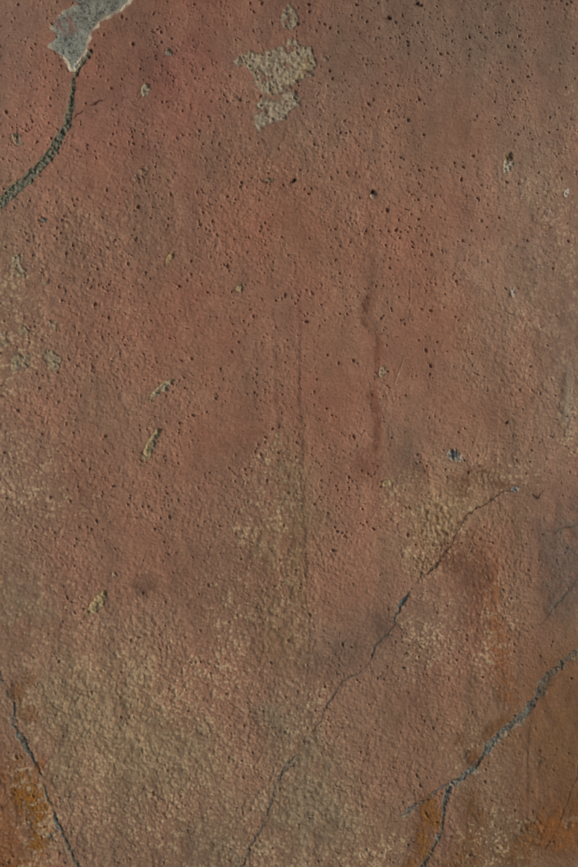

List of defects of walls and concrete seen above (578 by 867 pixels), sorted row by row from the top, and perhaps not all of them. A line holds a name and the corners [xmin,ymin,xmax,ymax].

crack [0,49,102,209]
spalling [48,0,133,72]
spalling [234,3,328,131]
crack [0,675,78,867]
crack [399,649,578,867]